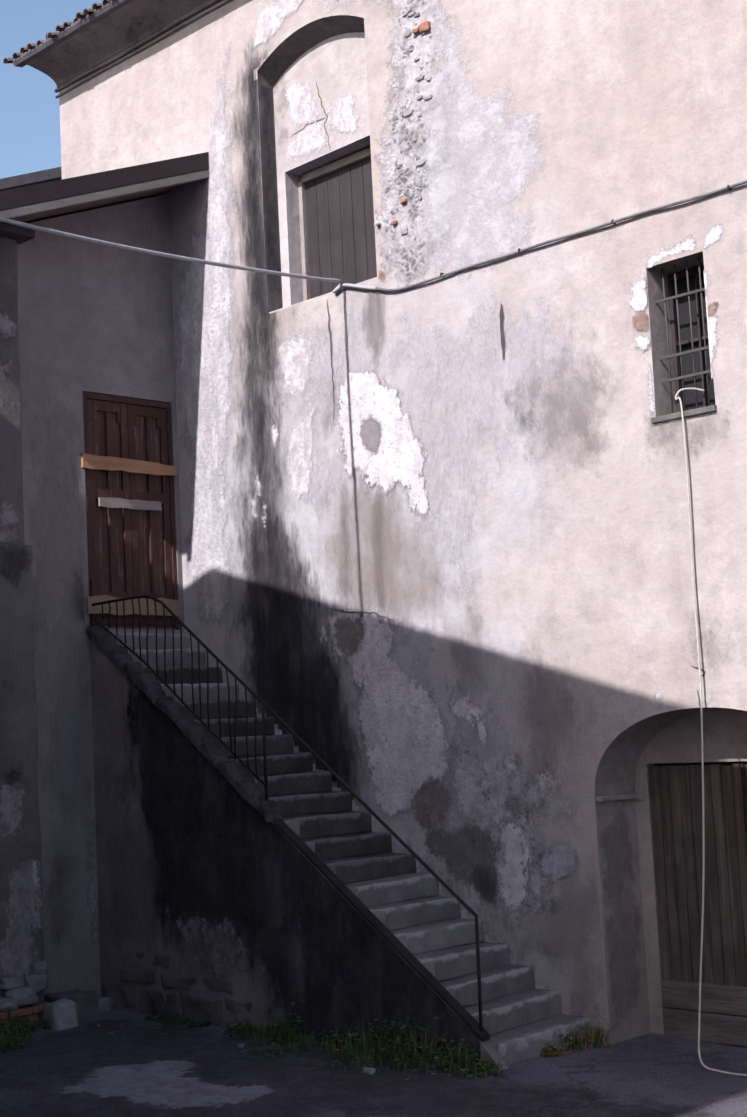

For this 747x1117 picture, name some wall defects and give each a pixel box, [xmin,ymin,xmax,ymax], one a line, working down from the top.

flaking render [255,0,302,46]
flaking render [285,81,358,158]
peeling [362,0,542,284]
damp [238,55,359,800]
flaking render [337,367,432,517]
flaking render [647,364,686,422]
flaking render [629,224,724,351]
flaking render [703,269,718,378]
flaking render [319,604,575,933]
flaking render [0,860,52,1033]
flaking render [176,915,267,979]
damp [122,676,481,1067]